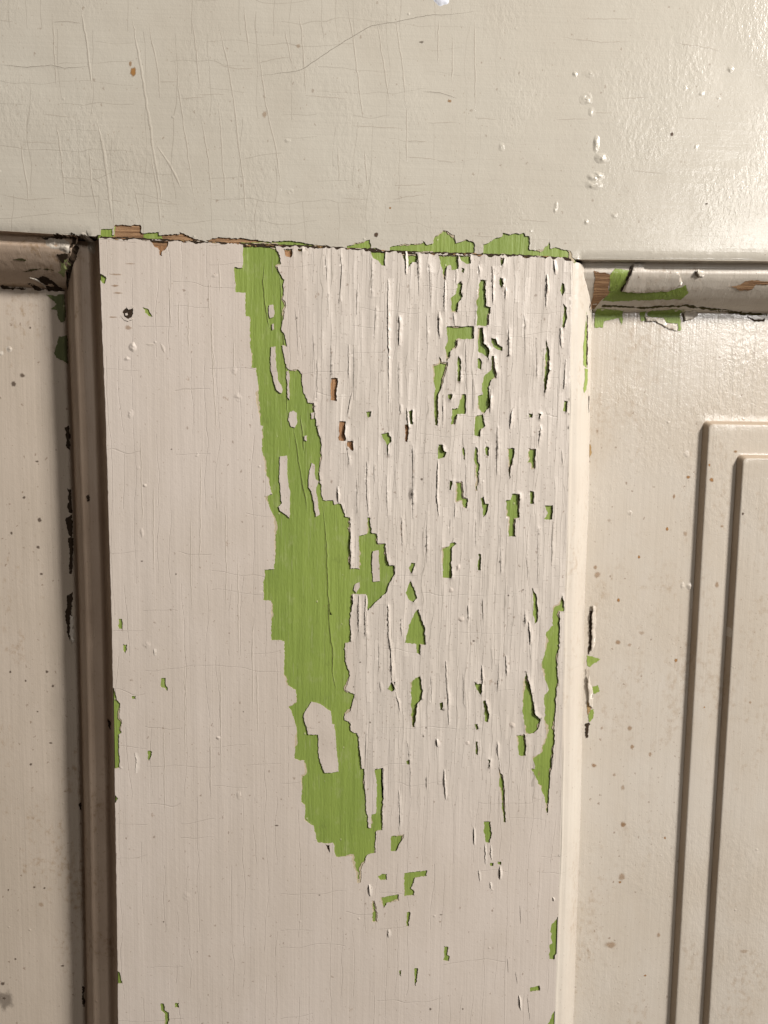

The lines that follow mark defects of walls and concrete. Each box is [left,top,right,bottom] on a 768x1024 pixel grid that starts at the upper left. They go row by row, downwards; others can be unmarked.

crack [1,3,571,711]
peeling [347,230,576,312]
peeling [432,280,502,517]
peeling [583,264,698,393]
peeling [98,225,404,883]
peeling [405,563,426,655]
crack [586,611,594,655]
crack [426,611,534,800]
peeling [516,597,564,812]
crack [365,742,403,832]
crack [473,827,503,889]
crack [507,959,530,1020]